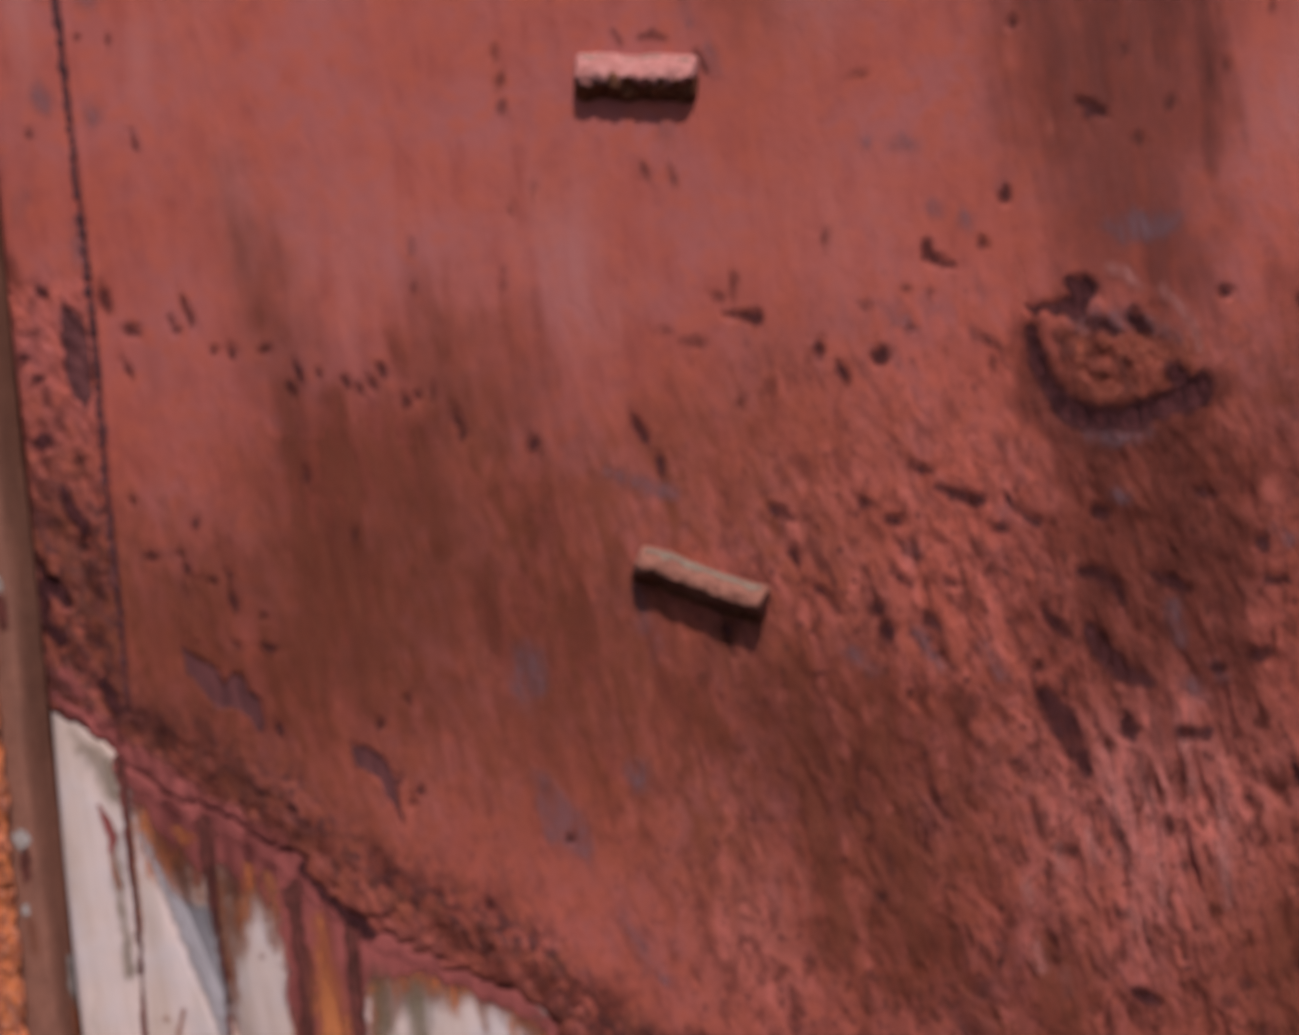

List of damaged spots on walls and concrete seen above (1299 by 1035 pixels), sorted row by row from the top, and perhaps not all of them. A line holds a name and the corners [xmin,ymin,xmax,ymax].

corrosion [1020,274,1231,449]
peeling [349,741,423,825]
peeling [12,829,31,851]
corrosion [20,849,31,883]
corrosion [51,666,559,1035]
peeling [67,954,80,1013]